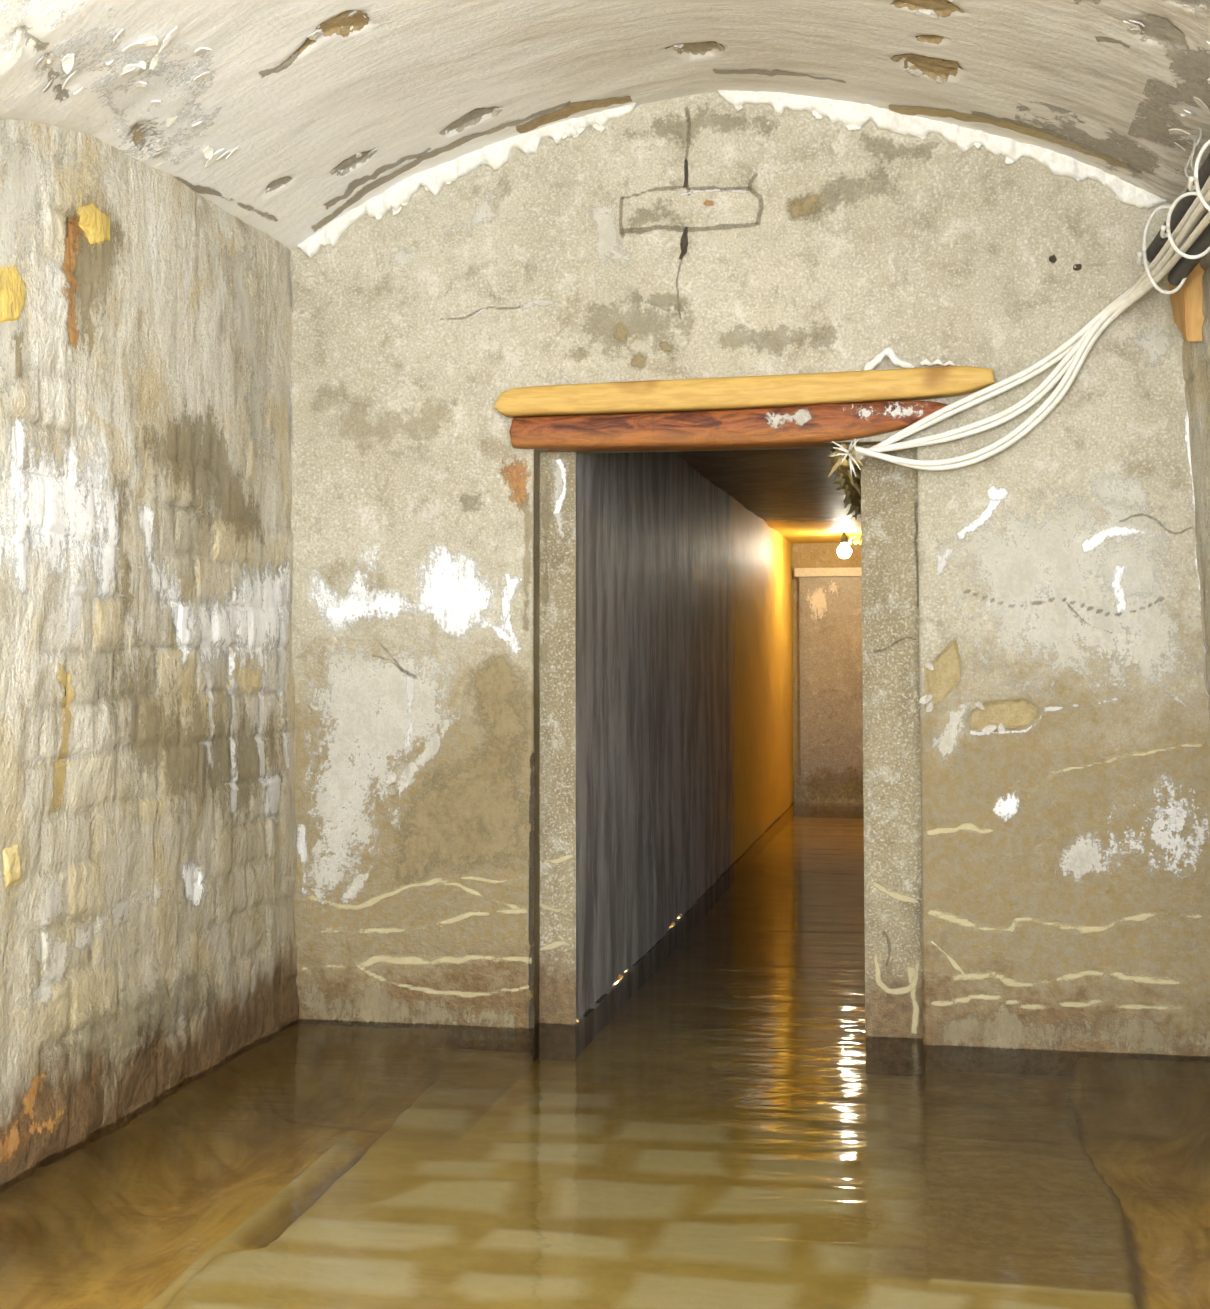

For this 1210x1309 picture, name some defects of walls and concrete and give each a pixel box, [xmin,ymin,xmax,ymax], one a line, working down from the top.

spalling [284,10,369,63]
flaking render [9,25,240,168]
flaking render [718,0,1210,209]
damp [0,400,551,910]
spalling [919,638,961,712]
spalling [969,698,1037,735]
damp [441,902,565,924]